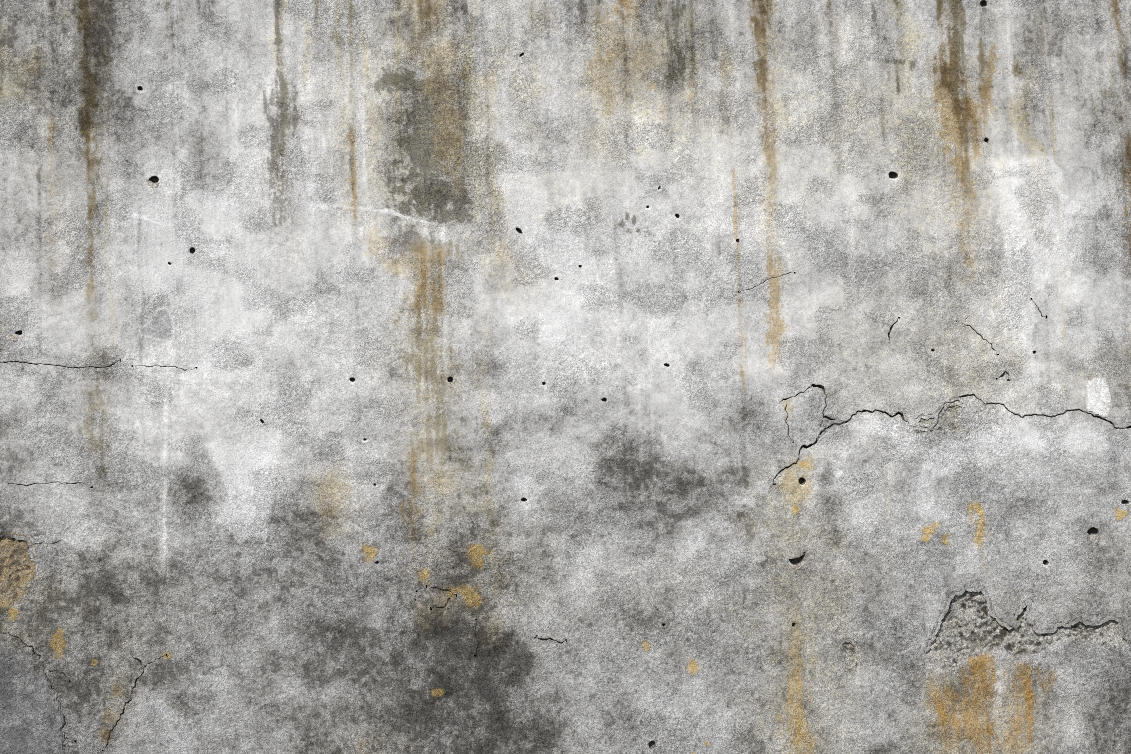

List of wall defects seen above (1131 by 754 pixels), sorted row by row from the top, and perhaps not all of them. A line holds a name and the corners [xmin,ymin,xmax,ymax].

leakage [251,0,490,485]
corrosion [384,0,527,280]
corrosion [525,0,695,157]
corrosion [715,0,798,423]
corrosion [920,0,1028,301]
corrosion [344,102,508,656]
crack [772,314,1131,484]
spalling [0,528,60,606]
peeling [0,630,69,754]
corrosion [892,648,1081,754]
spalling [920,583,1131,671]